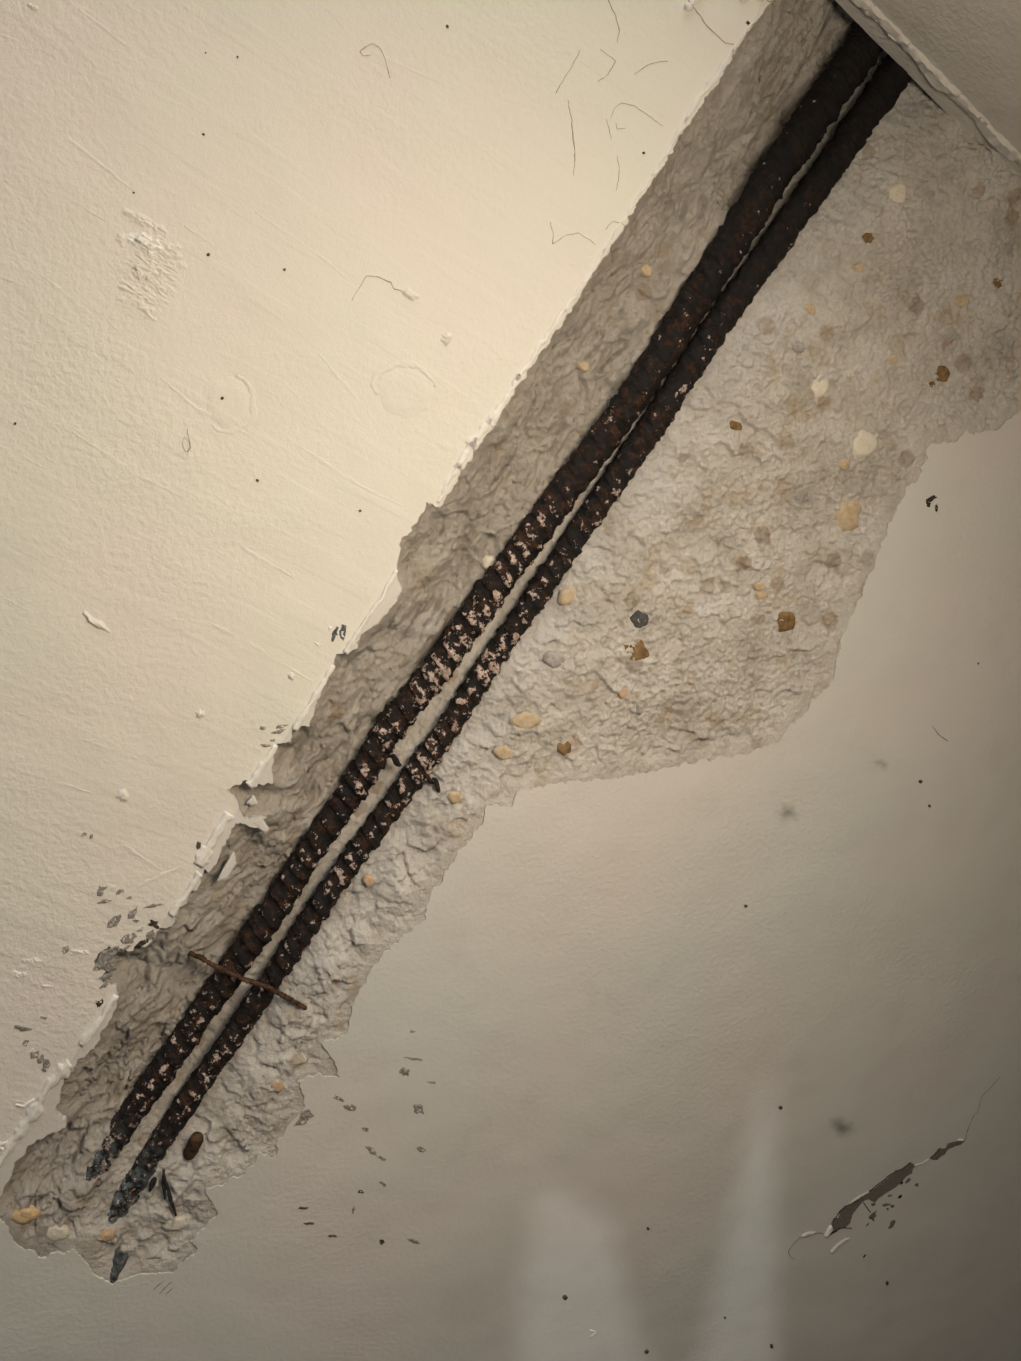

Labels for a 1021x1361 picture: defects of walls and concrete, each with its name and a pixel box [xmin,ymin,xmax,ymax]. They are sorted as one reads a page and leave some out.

spalling [721,50,888,292]
spalling [888,183,907,203]
spalling [437,0,767,503]
spalling [804,304,816,315]
spalling [791,340,804,353]
spalling [811,374,829,397]
spalling [935,366,950,382]
spalling [776,612,795,632]
spalling [244,394,655,981]
spalling [135,929,155,948]
spalling [93,945,131,981]
spalling [13,1016,50,1072]